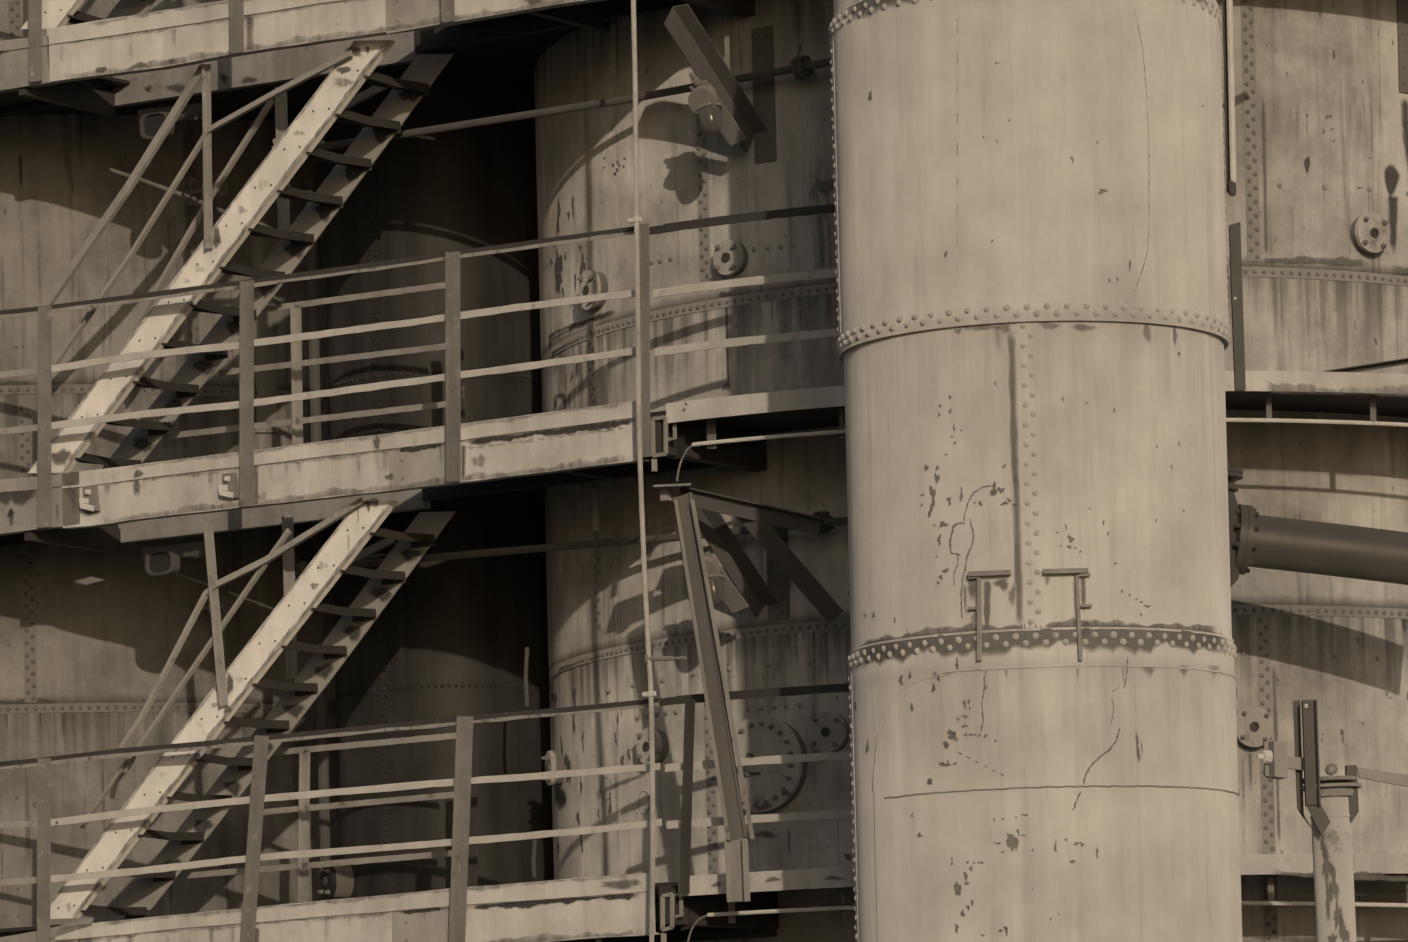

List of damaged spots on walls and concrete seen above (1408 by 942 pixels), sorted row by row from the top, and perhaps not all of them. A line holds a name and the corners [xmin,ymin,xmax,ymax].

corrosion [1385,165,1399,247]
peeling [920,395,1016,585]
peeling [927,699,997,785]
crack [1073,658,1128,809]
peeling [993,814,1033,853]
peeling [951,857,984,933]